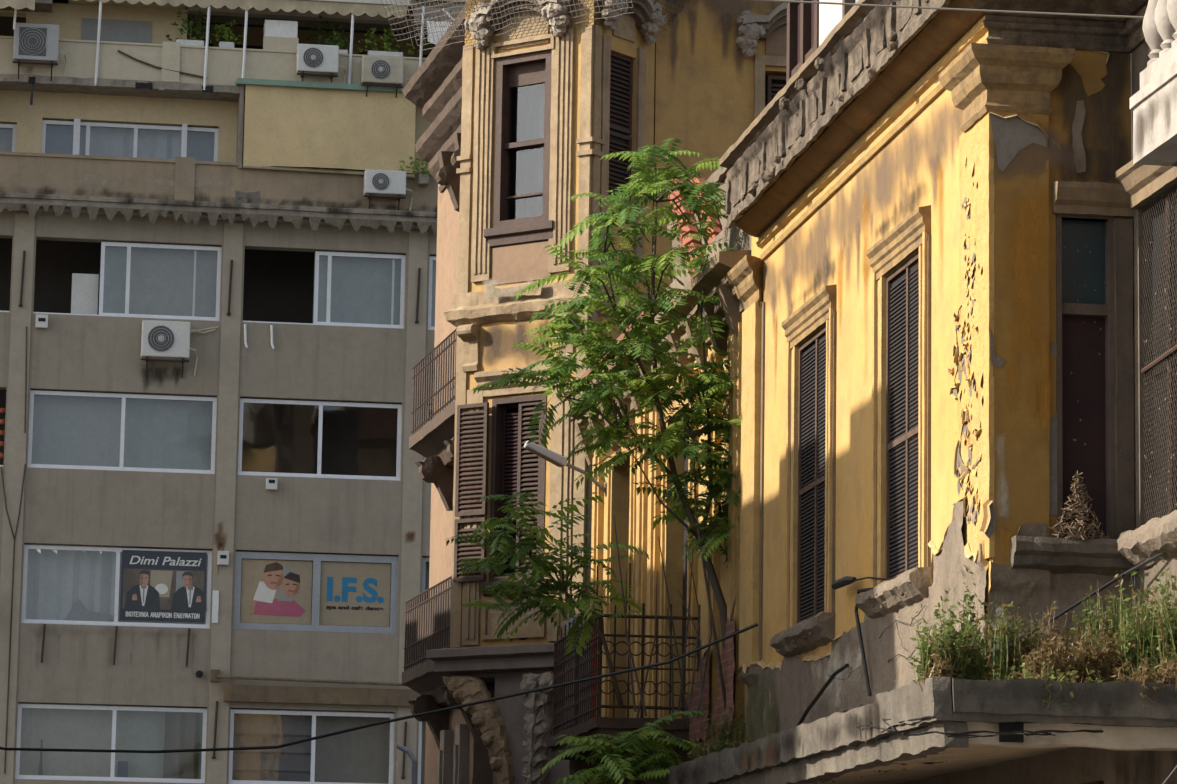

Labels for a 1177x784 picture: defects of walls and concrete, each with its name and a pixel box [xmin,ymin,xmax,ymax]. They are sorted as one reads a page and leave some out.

water stain [601,0,787,67]
flaking render [989,50,1109,174]
water stain [766,109,962,309]
flaking render [681,155,1135,748]
crack [879,605,926,662]